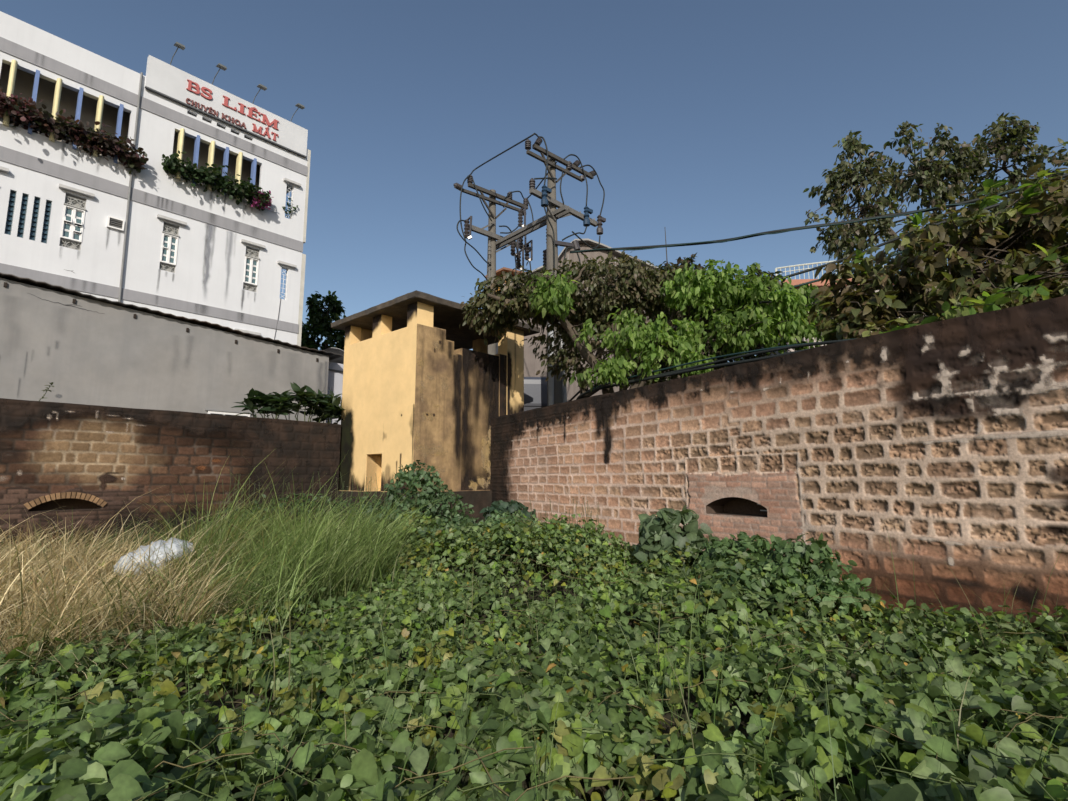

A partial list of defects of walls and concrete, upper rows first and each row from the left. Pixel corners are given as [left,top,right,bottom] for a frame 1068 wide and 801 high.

water stain [0,395,365,547]
water stain [442,295,1068,503]
water stain [1013,585,1039,604]